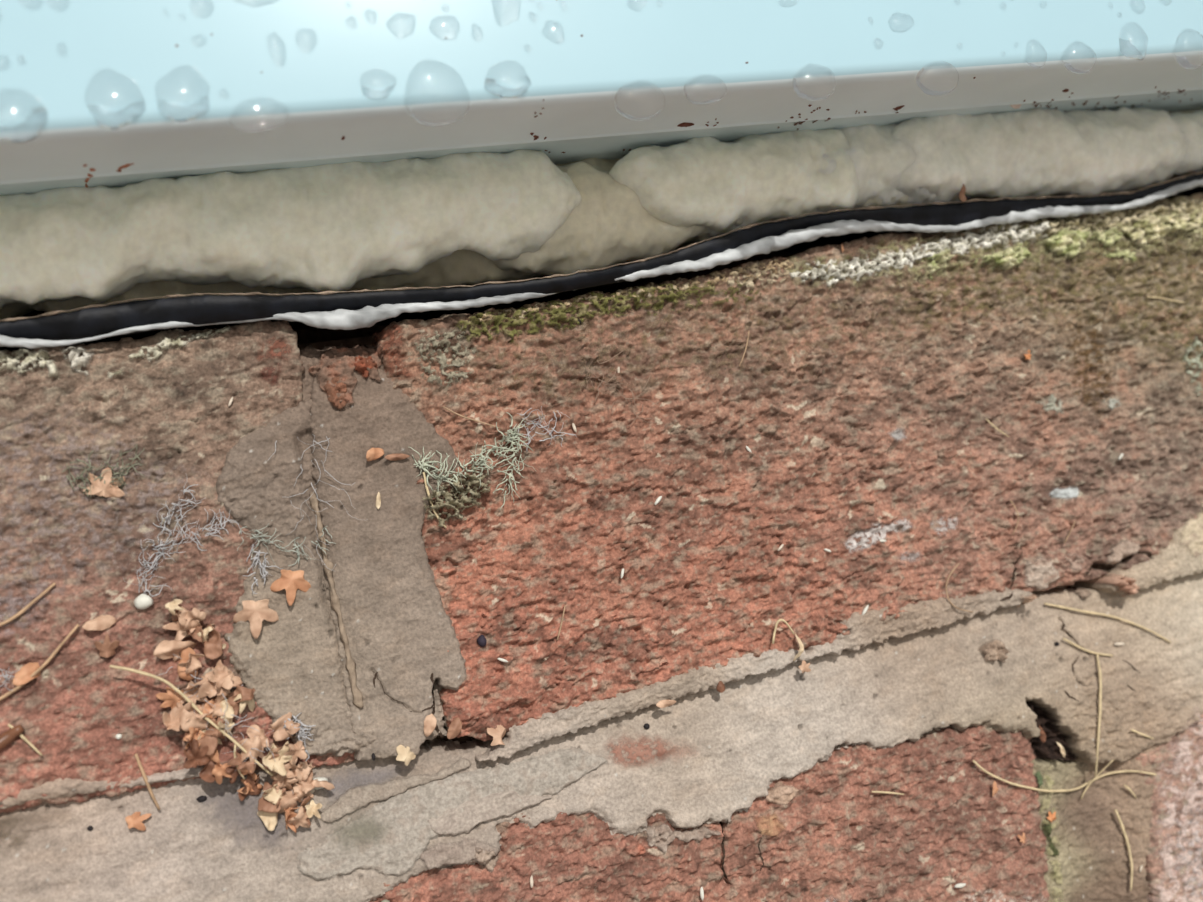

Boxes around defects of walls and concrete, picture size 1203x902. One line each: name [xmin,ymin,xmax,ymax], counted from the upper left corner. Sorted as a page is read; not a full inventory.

spalling [259,340,290,385]
spalling [309,324,412,409]
crack [1000,554,1022,601]
spalling [1054,554,1140,599]
spalling [979,640,1009,662]
spalling [1026,701,1077,762]
peeling [296,746,607,881]
spalling [756,786,799,836]
spalling [626,824,721,857]
crack [720,820,731,885]